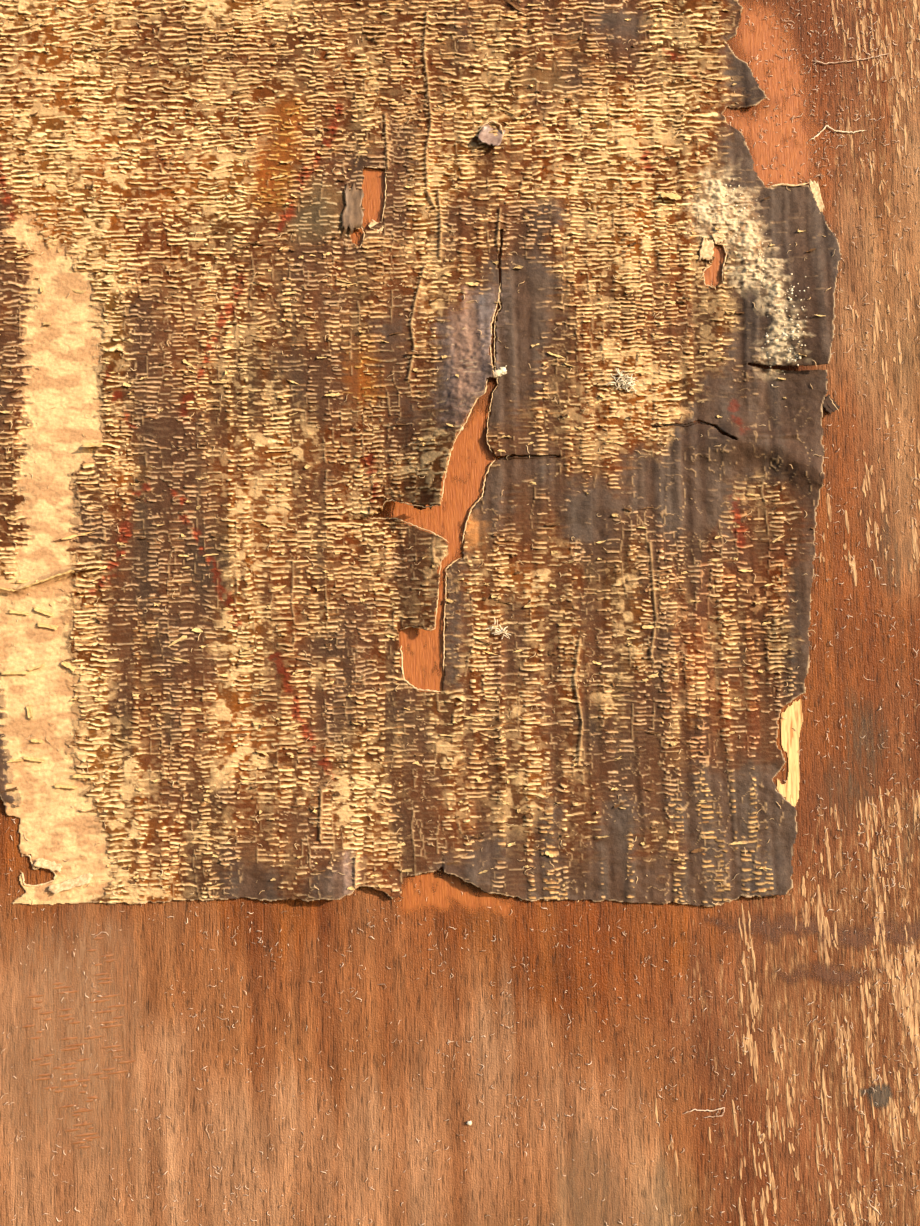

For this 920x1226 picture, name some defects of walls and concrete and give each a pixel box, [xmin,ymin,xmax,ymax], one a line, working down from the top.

peeling [478,103,529,146]
peeling [712,0,812,200]
peeling [235,150,387,275]
peeling [608,179,730,288]
peeling [183,358,246,393]
crack [655,421,722,435]
crack [498,453,558,461]
crack [370,499,448,542]
peeling [0,207,147,905]
peeling [383,406,510,694]
peeling [155,628,209,678]
peeling [400,862,511,918]